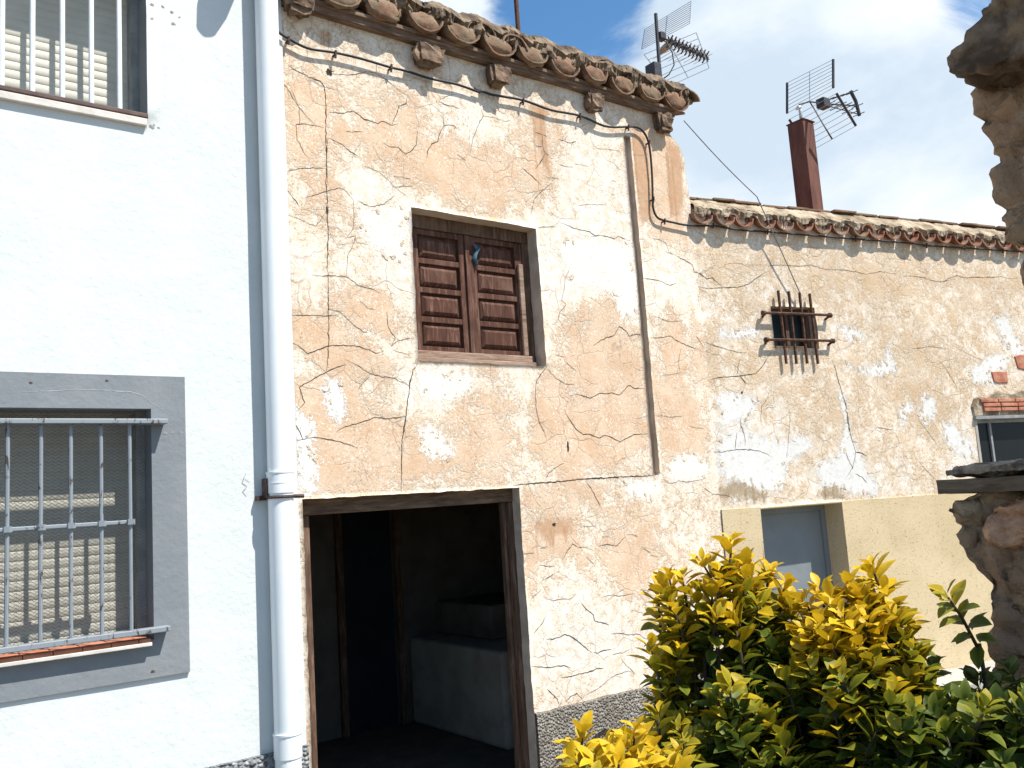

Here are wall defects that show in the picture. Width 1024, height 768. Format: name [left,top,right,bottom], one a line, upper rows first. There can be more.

crack [284,65,509,484]
flaking render [295,372,352,497]
flaking render [412,364,480,464]
crack [535,355,696,442]
crack [596,316,771,382]
flaking render [621,386,882,504]
crack [718,400,790,457]
crack [832,361,937,482]
flaking render [968,311,1024,416]
crack [518,464,734,703]